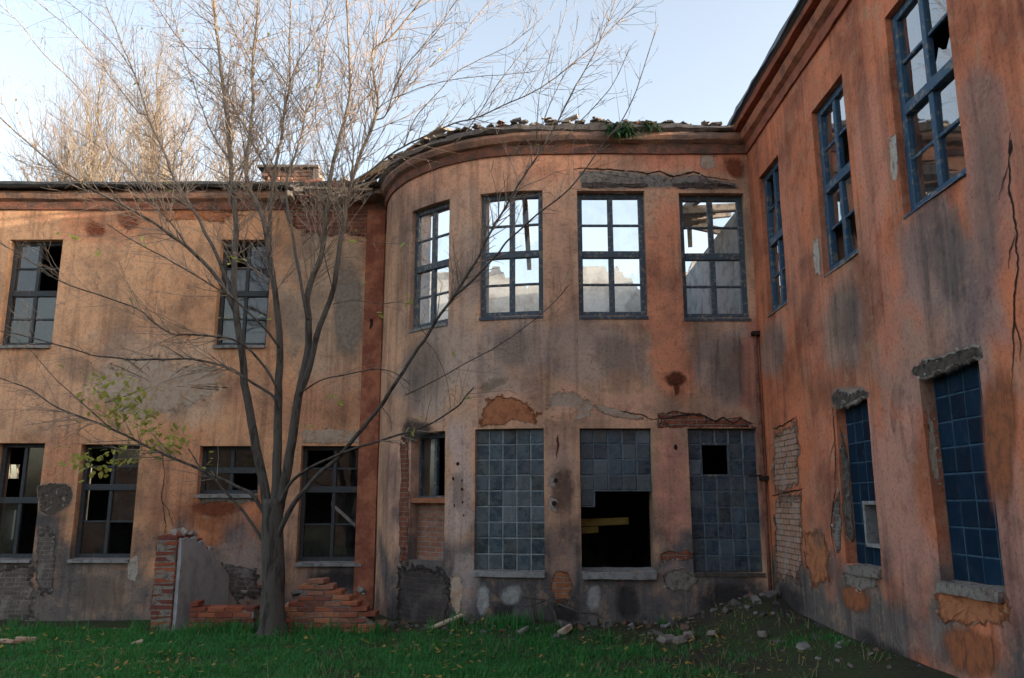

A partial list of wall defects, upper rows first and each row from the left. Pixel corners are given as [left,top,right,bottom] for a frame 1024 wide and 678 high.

flaking render [578,154,740,190]
crack [998,132,1021,387]
flaking render [478,389,644,427]
flaking render [658,410,759,429]
flaking render [37,482,73,515]
crack [161,456,173,534]
flaking render [771,418,878,593]
flaking render [396,437,464,623]
flaking render [934,592,1010,628]